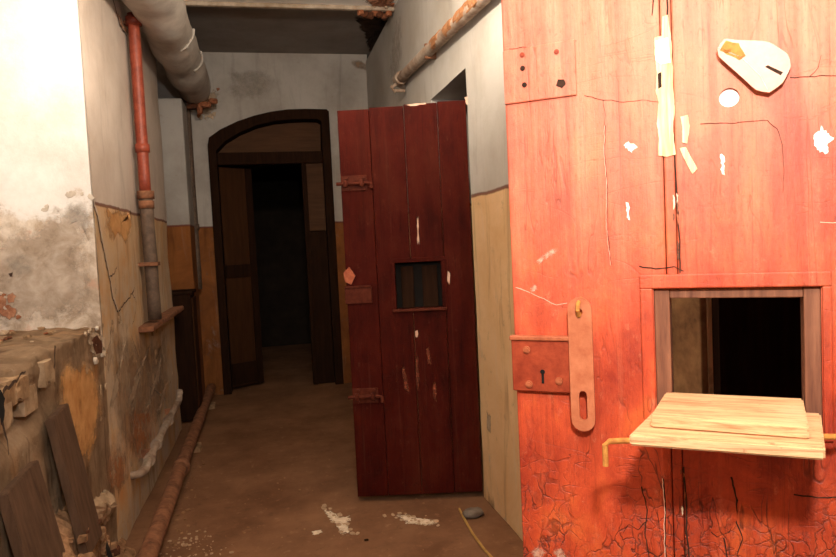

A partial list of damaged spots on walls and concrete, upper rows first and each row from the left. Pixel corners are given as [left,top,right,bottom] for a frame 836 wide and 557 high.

peeling [814,126,834,154]
peeling [0,204,86,321]
crack [93,200,136,322]
spalling [84,326,106,365]
crack [0,371,26,455]
spalling [0,358,55,434]
crack [623,479,667,557]
crack [711,477,743,557]
crack [794,492,836,500]